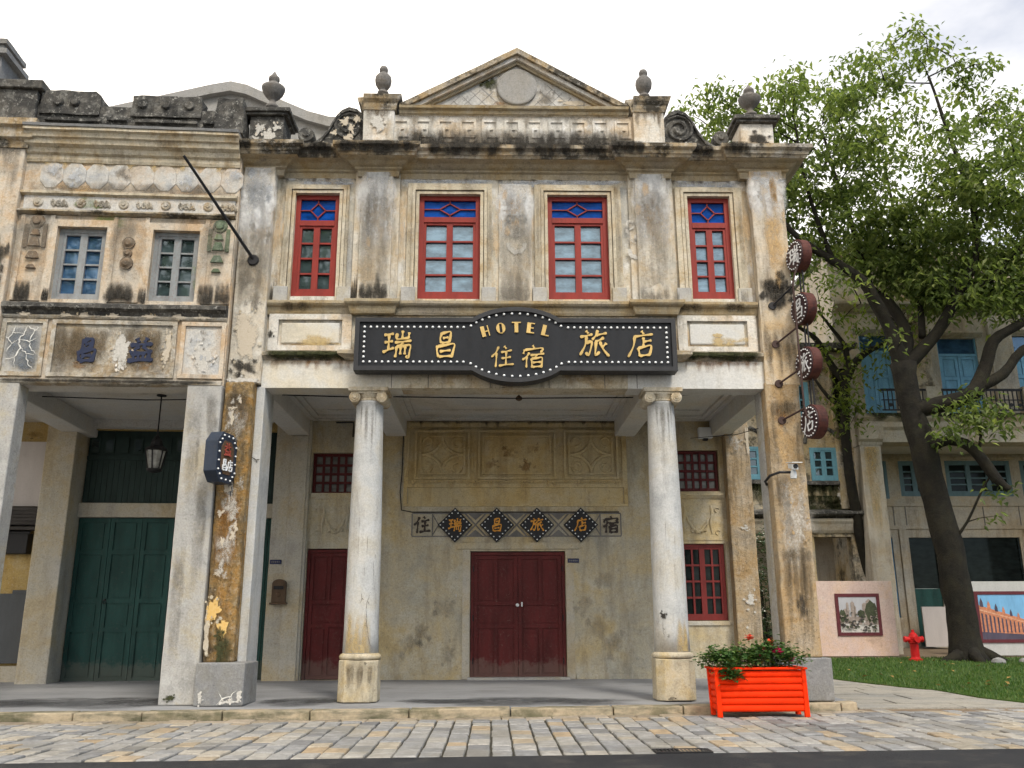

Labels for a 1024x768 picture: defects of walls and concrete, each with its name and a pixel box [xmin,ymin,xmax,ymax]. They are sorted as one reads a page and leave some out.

peeling [252,121,282,139]
water stain [231,130,805,188]
water stain [13,283,48,301]
water stain [104,285,145,304]
water stain [194,285,229,306]
water stain [759,270,793,309]
crack [6,326,38,368]
peeling [106,313,134,372]
peeling [161,314,217,375]
peeling [228,395,244,434]
peeling [213,479,243,578]
peeling [203,595,229,657]